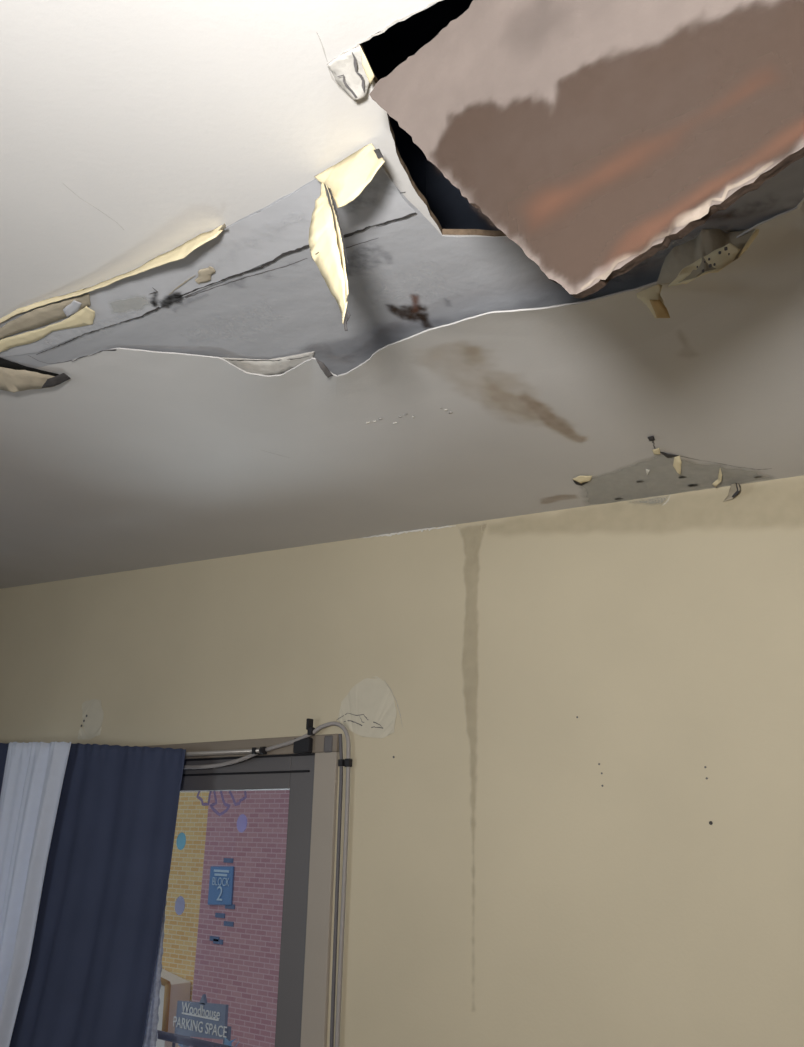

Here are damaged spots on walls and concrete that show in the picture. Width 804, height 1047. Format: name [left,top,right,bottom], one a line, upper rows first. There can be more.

peeling [340,0,442,56]
leakage [434,0,804,285]
peeling [0,143,804,393]
peeling [573,455,761,505]